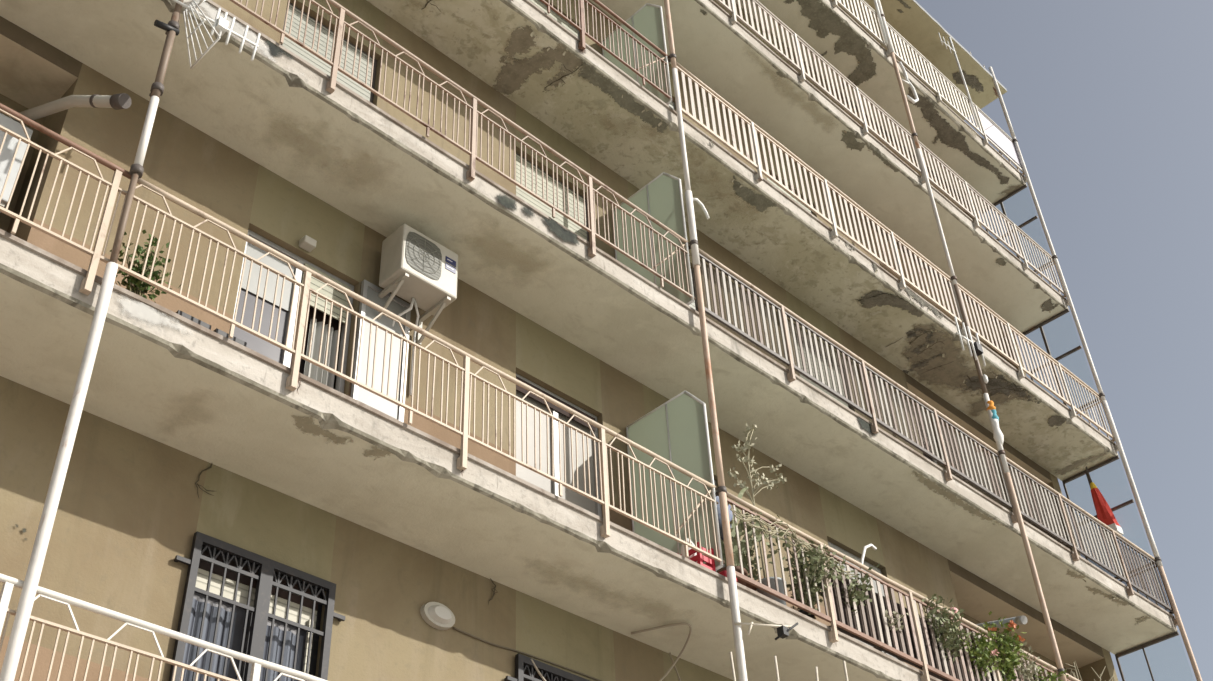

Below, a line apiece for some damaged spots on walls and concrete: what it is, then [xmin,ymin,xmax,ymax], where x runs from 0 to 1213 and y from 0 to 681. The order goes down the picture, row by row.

peeling [492,26,669,133]
peeling [783,0,877,89]
spalling [952,70,998,97]
spalling [908,87,1010,185]
spalling [858,287,948,374]
spalling [960,375,1042,404]
spalling [1048,415,1066,428]
crack [195,463,214,498]